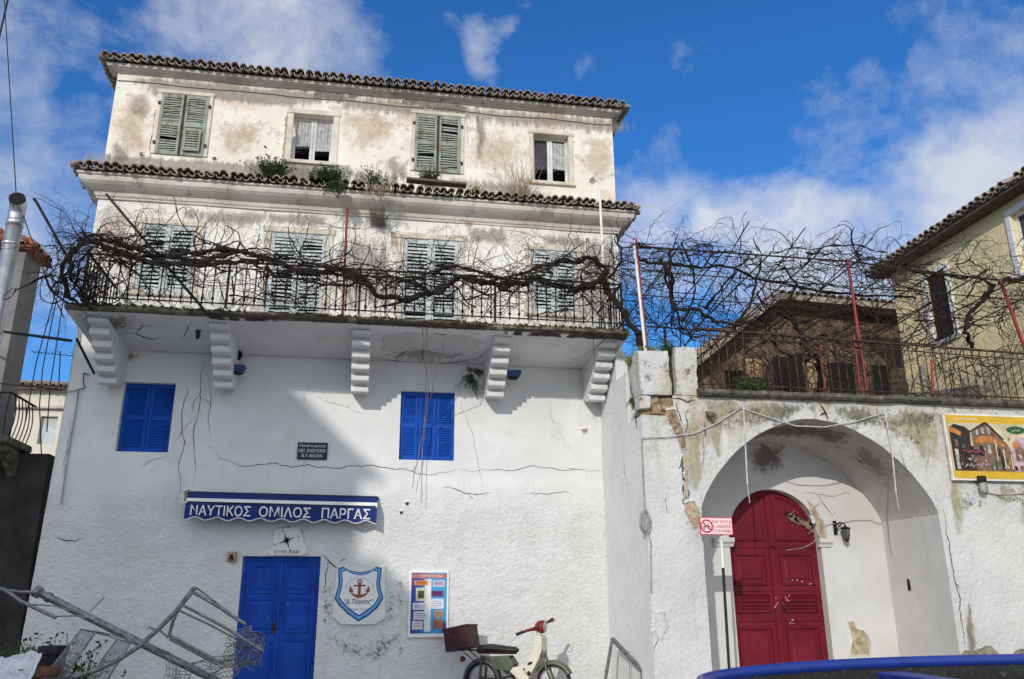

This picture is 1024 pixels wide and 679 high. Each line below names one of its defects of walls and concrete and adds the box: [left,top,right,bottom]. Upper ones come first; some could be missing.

water stain [366,207,389,228]
spalling [381,331,482,355]
crack [146,361,595,501]
spalling [636,356,703,530]
spalling [847,618,872,658]
crack [943,511,965,645]